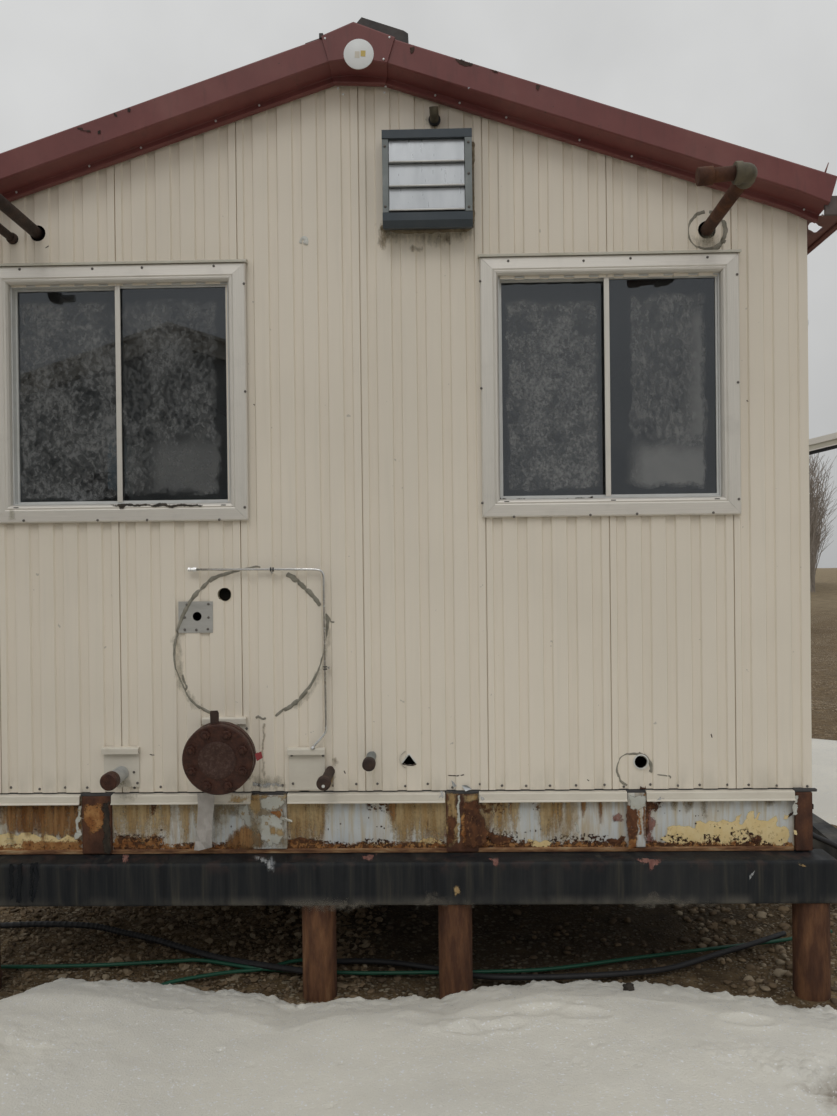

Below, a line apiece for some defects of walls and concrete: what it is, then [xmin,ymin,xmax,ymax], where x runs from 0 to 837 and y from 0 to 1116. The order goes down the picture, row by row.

peeling [0,806,83,849]
peeling [238,796,292,847]
rust [0,794,793,854]
peeling [660,796,798,846]